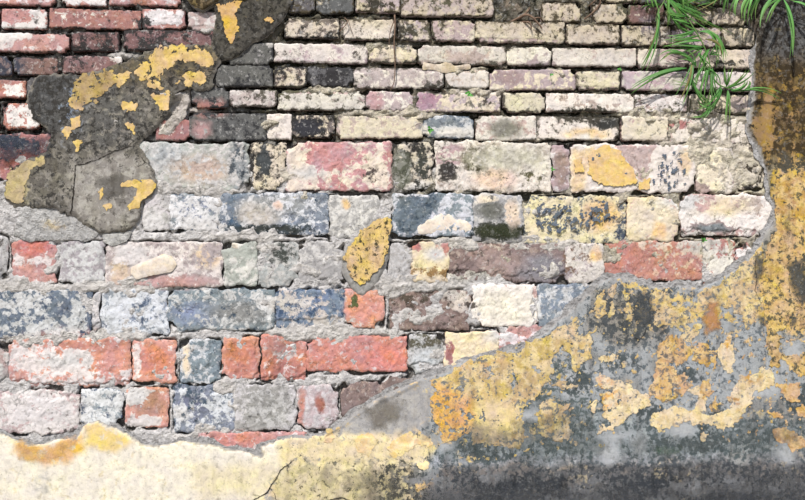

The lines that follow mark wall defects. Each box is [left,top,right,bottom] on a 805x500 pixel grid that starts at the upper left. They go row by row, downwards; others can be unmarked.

peeling [216,0,242,44]
peeling [182,70,206,87]
peeling [121,101,138,112]
peeling [151,90,170,111]
peeling [62,115,81,140]
peeling [121,179,156,210]
peeling [650,171,805,433]
peeling [589,250,764,435]
peeling [552,375,578,393]
peeling [531,398,578,446]
peeling [762,394,805,453]
crack [254,461,292,500]